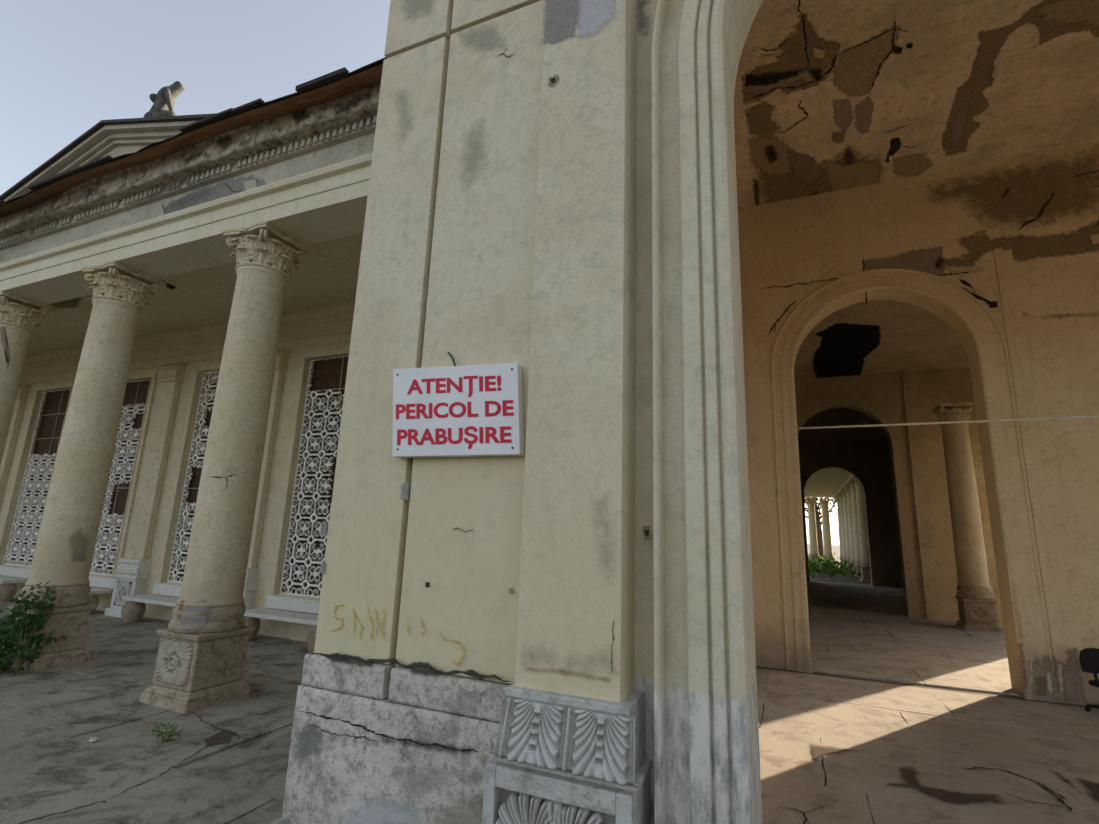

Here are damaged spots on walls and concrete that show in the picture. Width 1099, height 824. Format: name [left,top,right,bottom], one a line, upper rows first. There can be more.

flaking render [542,0,615,44]
flaking render [745,0,913,143]
flaking render [941,0,1099,156]
flaking render [745,102,933,191]
leakage [932,156,1099,230]
flaking render [862,223,1099,276]
crack [299,711,492,753]
leakage [811,745,849,761]
leakage [888,767,1001,804]
leakage [1049,770,1099,801]